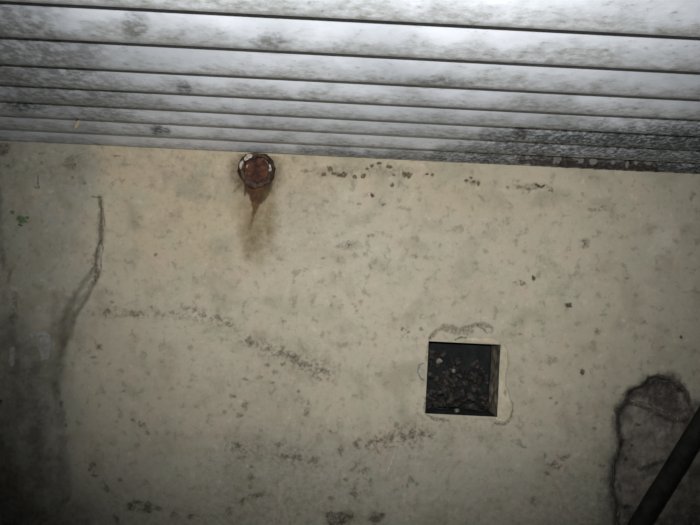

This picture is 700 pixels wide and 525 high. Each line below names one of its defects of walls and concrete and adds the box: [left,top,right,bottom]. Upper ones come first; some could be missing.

rust [233,158,276,216]
spalling [610,374,700,525]